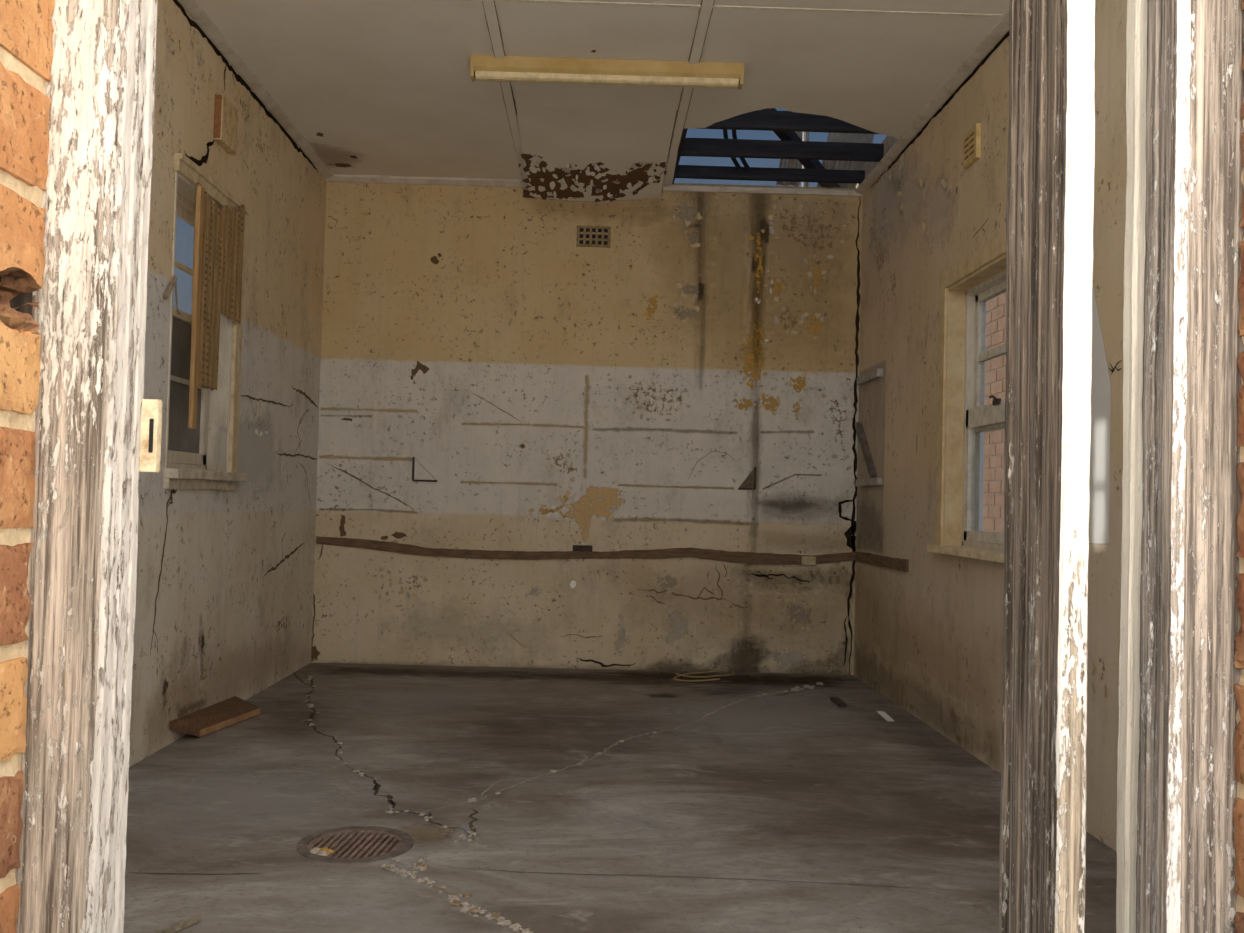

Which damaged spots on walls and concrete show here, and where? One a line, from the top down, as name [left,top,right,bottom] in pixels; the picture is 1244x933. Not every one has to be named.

crack [173,0,318,172]
peeling [518,154,667,202]
peeling [734,205,846,419]
peeling [529,451,625,545]
crack [293,31,1009,933]